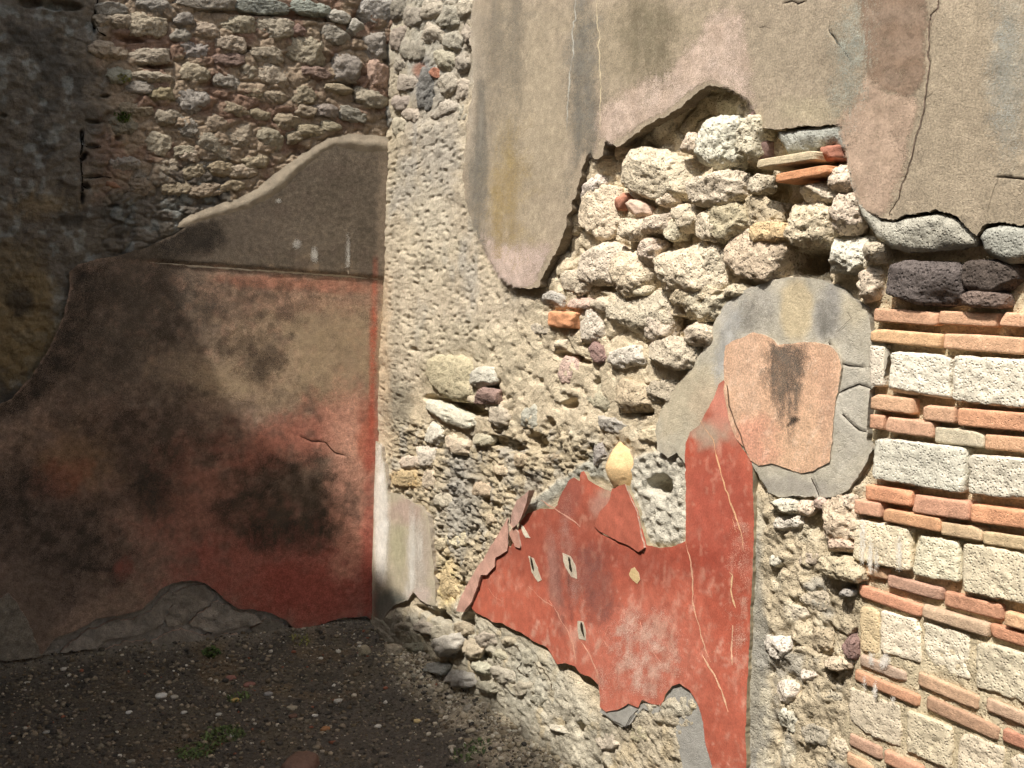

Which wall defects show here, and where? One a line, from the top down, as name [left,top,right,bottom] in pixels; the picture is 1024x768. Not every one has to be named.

spalling [87,0,473,218]
crack [889,0,941,215]
leakage [0,239,427,621]
spalling [387,2,921,768]
crack [701,422,743,546]
leakage [708,292,840,449]
crack [686,545,736,710]